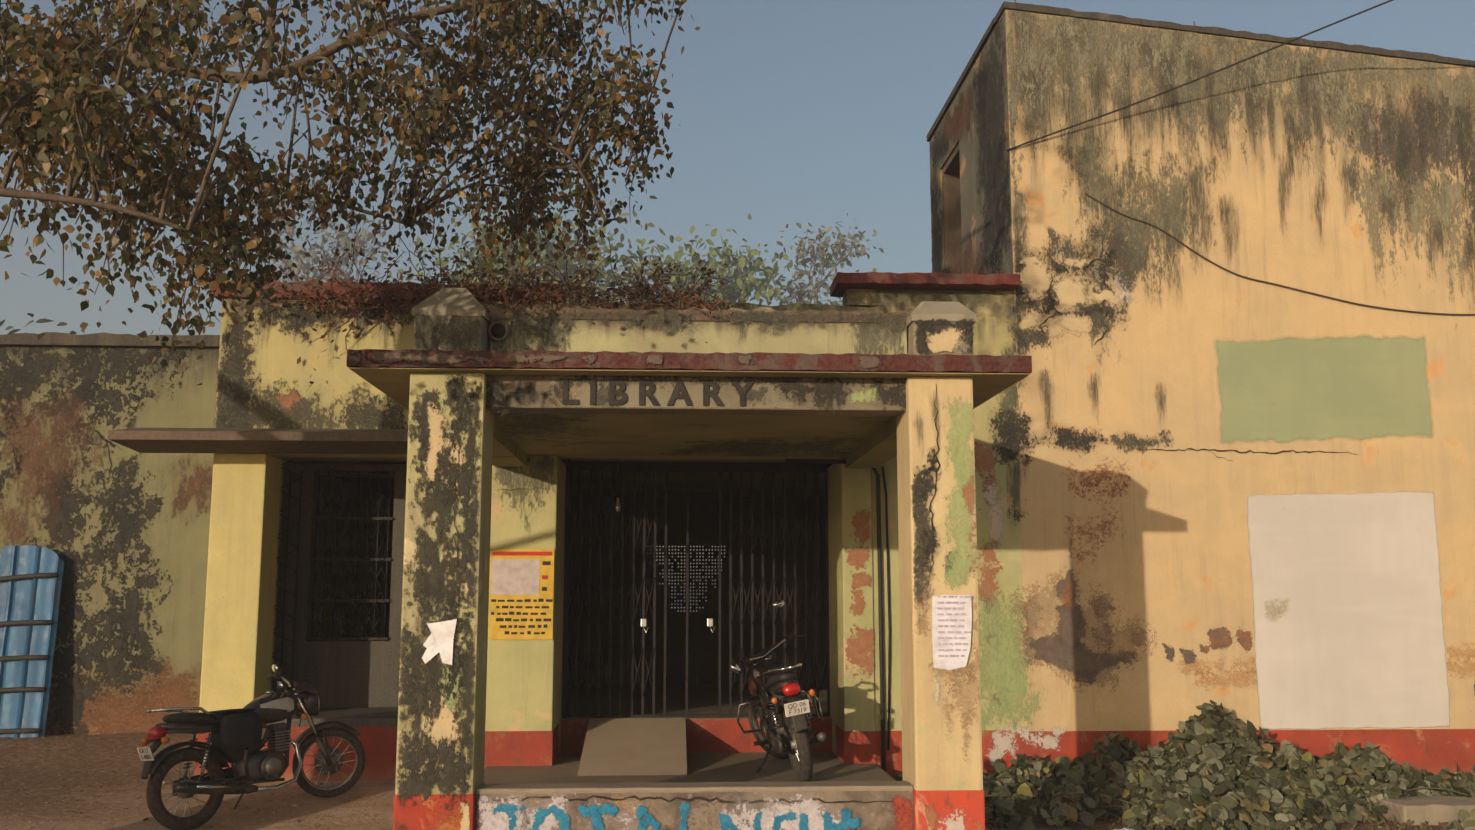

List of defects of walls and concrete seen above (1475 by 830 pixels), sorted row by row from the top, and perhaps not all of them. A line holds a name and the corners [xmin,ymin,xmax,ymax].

water stain [930,10,1475,355]
water stain [988,374,1171,522]
crack [1139,448,1358,461]
water stain [0,346,201,735]
water stain [214,298,974,810]
peeling [845,509,875,680]
flaking render [945,400,1142,685]
flaking render [1162,626,1253,664]
peeling [434,793,470,830]
peeling [985,722,1068,765]